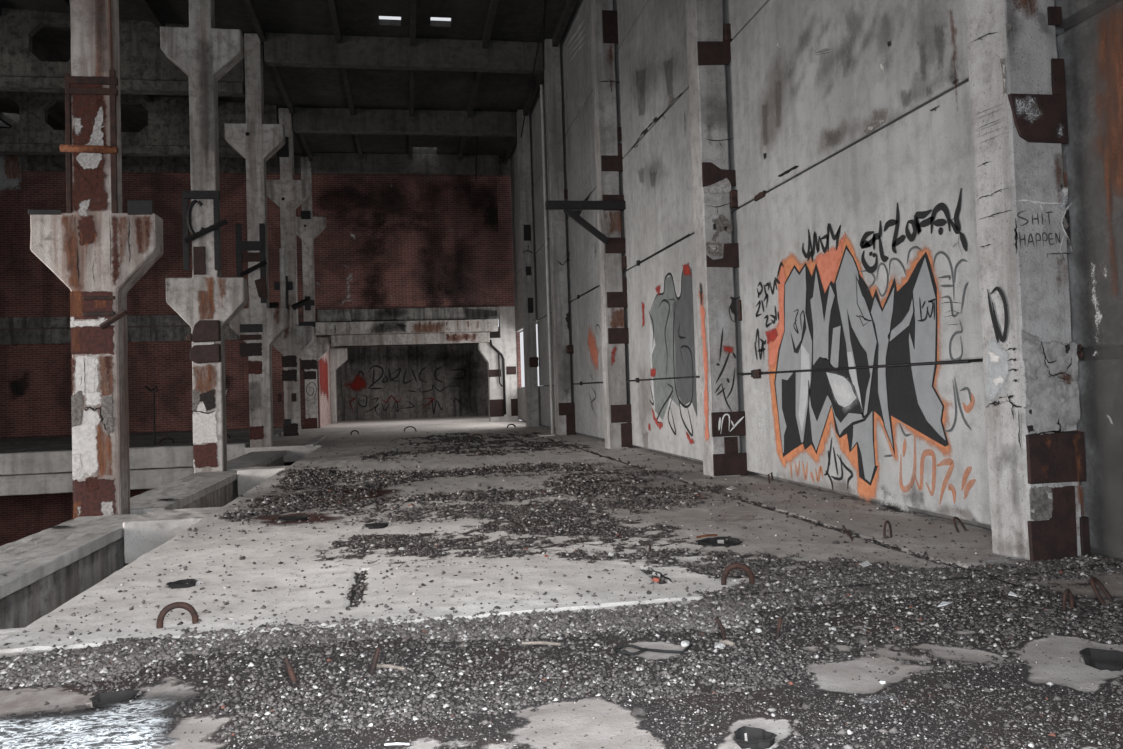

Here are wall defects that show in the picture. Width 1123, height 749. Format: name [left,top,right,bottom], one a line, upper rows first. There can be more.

spalling [74,107,105,169]
spalling [78,199,90,216]
rust [61,84,152,396]
peeling [71,355,102,479]
peeling [192,389,218,445]